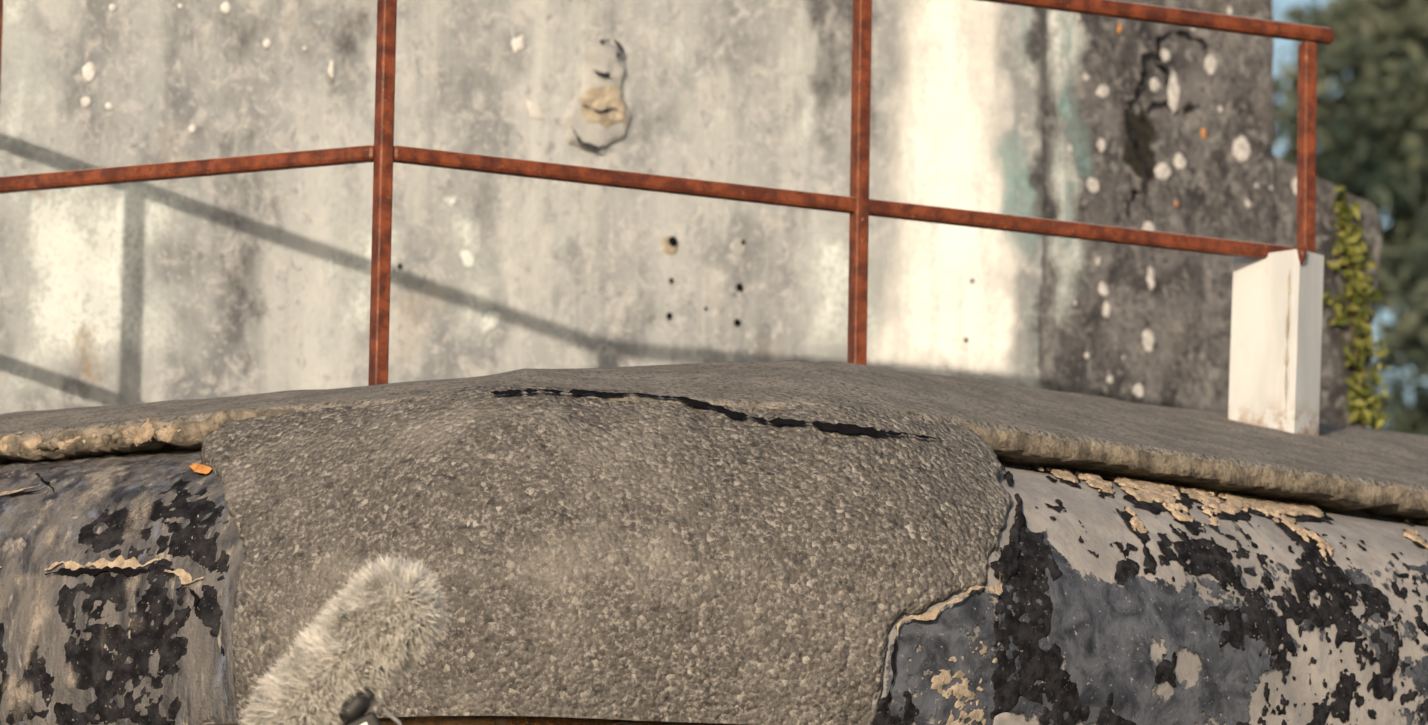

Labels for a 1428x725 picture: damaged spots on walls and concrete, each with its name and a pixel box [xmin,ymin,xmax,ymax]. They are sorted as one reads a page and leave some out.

crack [491,388,946,439]
peeling [0,473,230,725]
peeling [872,464,1428,725]